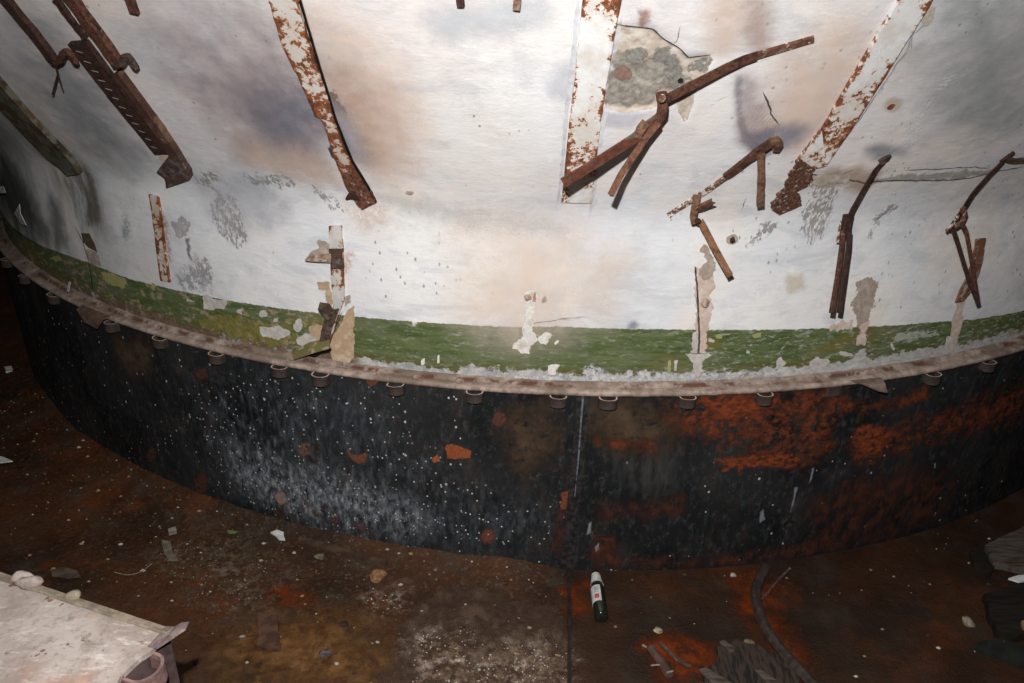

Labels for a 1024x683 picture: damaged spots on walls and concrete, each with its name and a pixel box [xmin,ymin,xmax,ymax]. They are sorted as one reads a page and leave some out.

corrosion [333,77,401,173]
spalling [605,24,713,122]
corrosion [887,99,900,110]
peeling [200,170,247,248]
peeling [244,175,295,190]
crack [811,167,1020,187]
peeling [132,216,355,363]
peeling [512,245,1022,382]
efflorescence [188,379,513,552]
corrosion [666,382,1024,472]